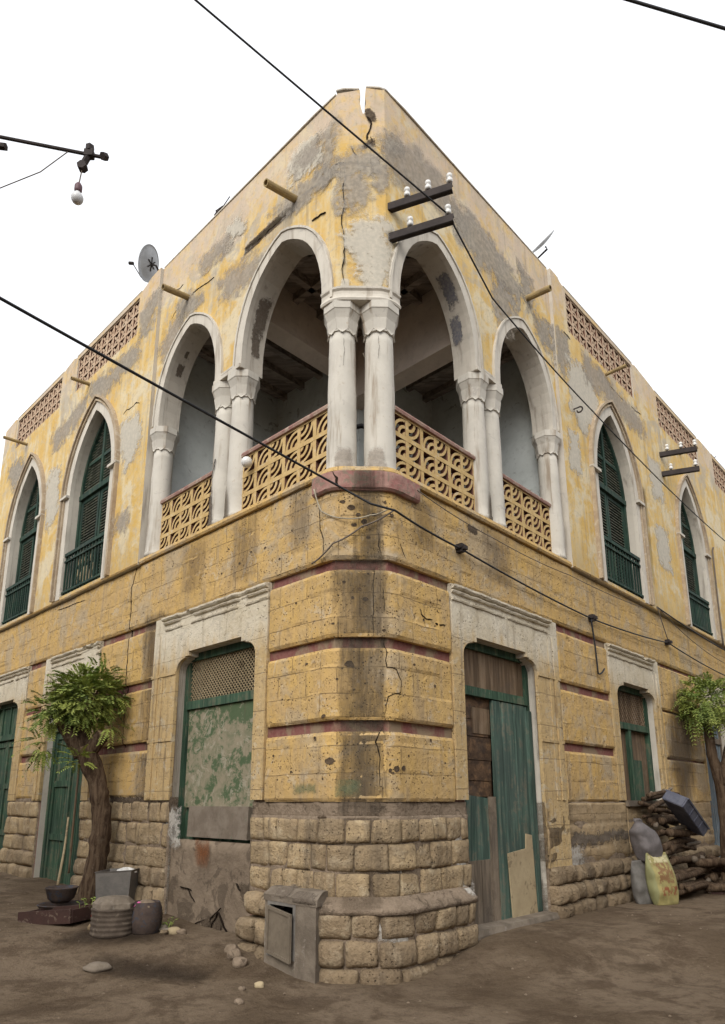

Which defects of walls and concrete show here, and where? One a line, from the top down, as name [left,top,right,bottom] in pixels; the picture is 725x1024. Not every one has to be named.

crack [312,108,376,282]
peeling [200,119,646,476]
leakage [144,582,270,847]
crack [372,533,406,784]